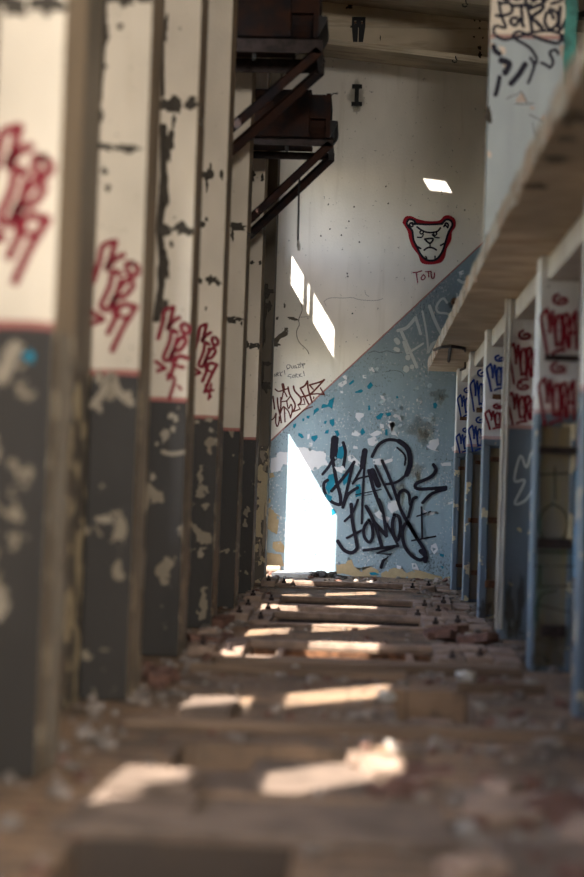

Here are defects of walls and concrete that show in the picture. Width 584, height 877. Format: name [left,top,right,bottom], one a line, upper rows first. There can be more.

spalling [0,0,69,17]
spalling [102,0,152,45]
spalling [98,143,142,154]
spalling [160,95,203,162]
spalling [159,174,169,210]
spalling [156,216,208,320]
peeling [0,338,24,382]
peeling [89,367,186,686]
peeling [0,587,10,621]